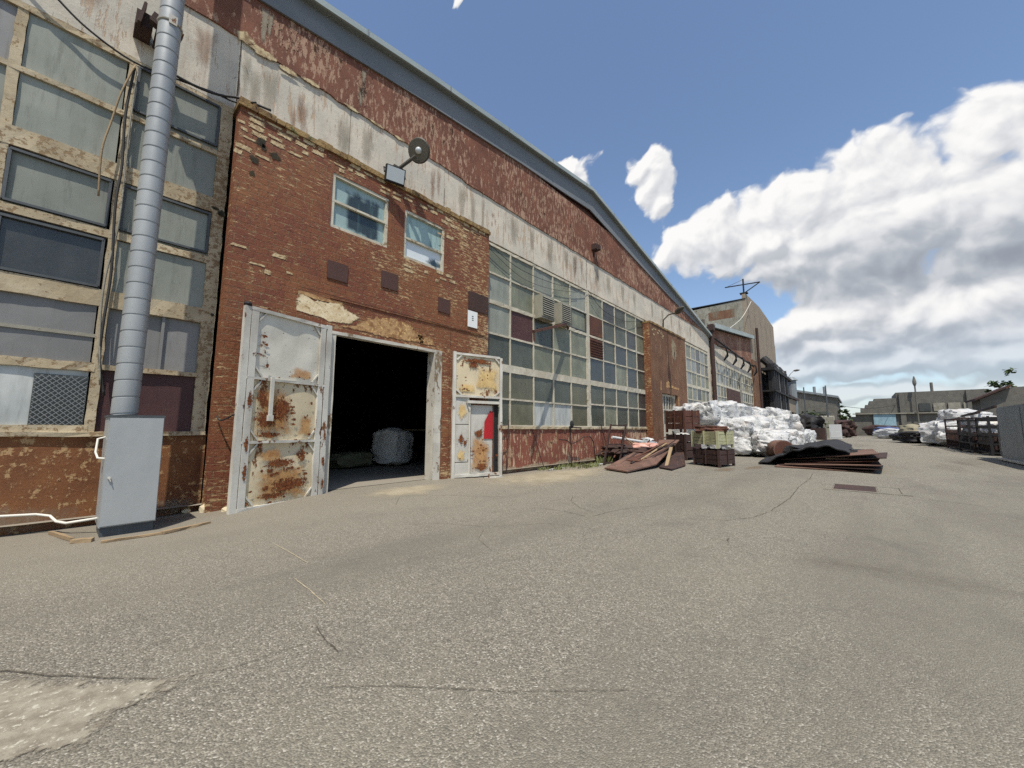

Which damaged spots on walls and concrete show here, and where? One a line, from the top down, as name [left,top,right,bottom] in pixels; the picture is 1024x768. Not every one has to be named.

peeling [312,37,383,128]
peeling [399,93,466,150]
peeling [233,112,485,246]
peeling [403,264,455,293]
flaking render [296,291,435,346]
corrosion [279,368,310,380]
corrosion [456,348,491,396]
corrosion [242,381,326,506]
corrosion [458,429,498,472]